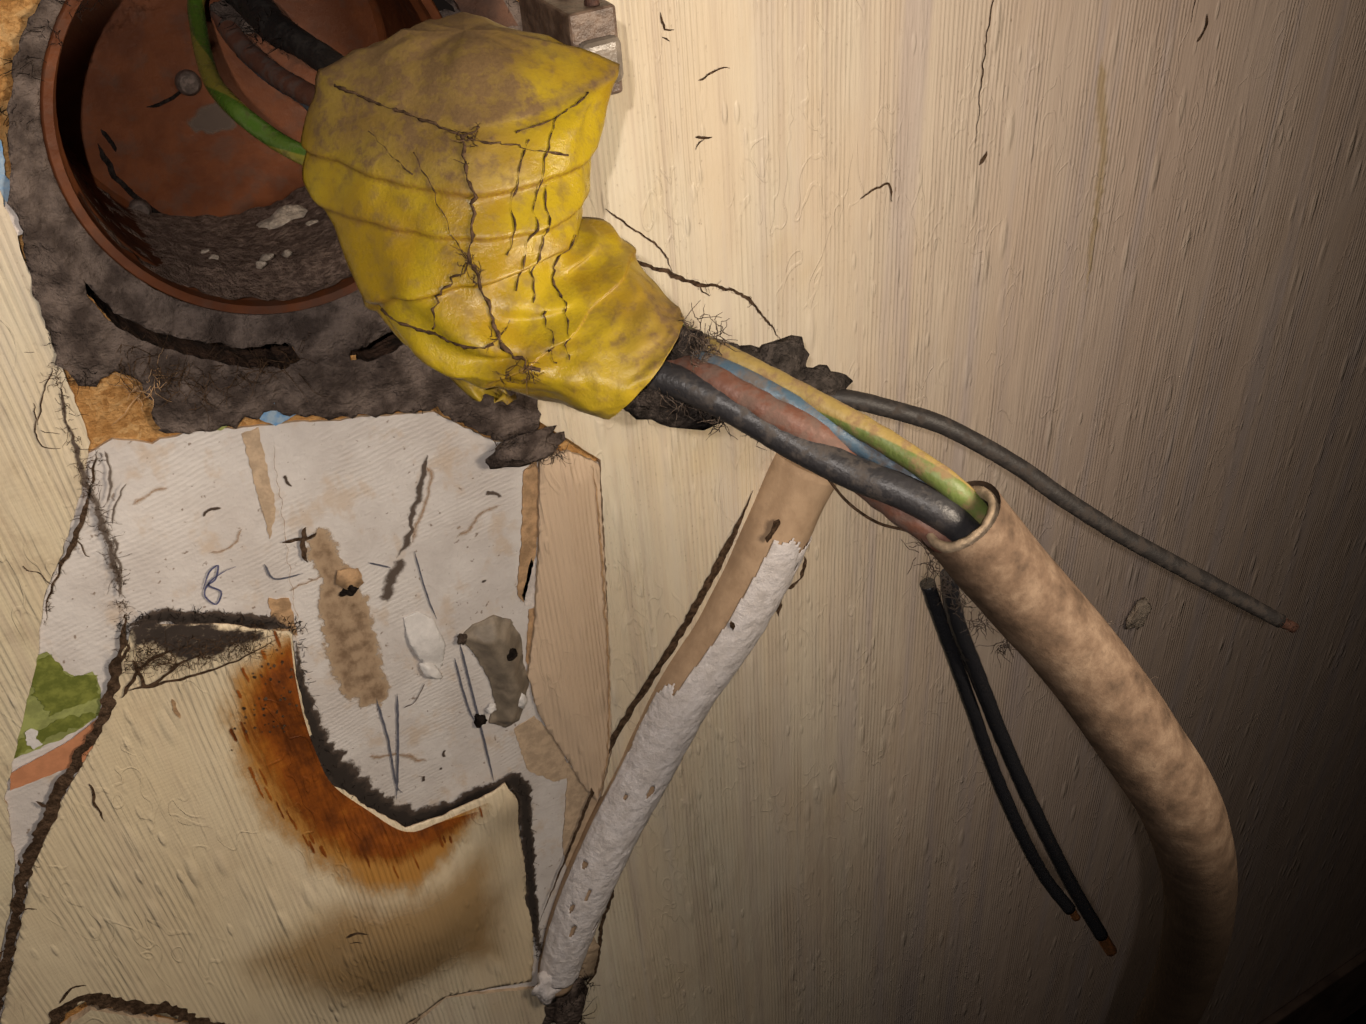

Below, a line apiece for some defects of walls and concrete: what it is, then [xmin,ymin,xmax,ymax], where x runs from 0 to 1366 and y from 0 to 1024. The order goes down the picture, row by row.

spalling [0,0,41,278]
spalling [83,280,300,369]
spalling [350,332,403,362]
crack [606,209,780,340]
crack [23,367,106,626]
crack [0,614,132,1011]
crack [48,985,225,1024]
peeling [0,369,601,1019]
rust [229,631,483,892]
crack [346,932,368,944]